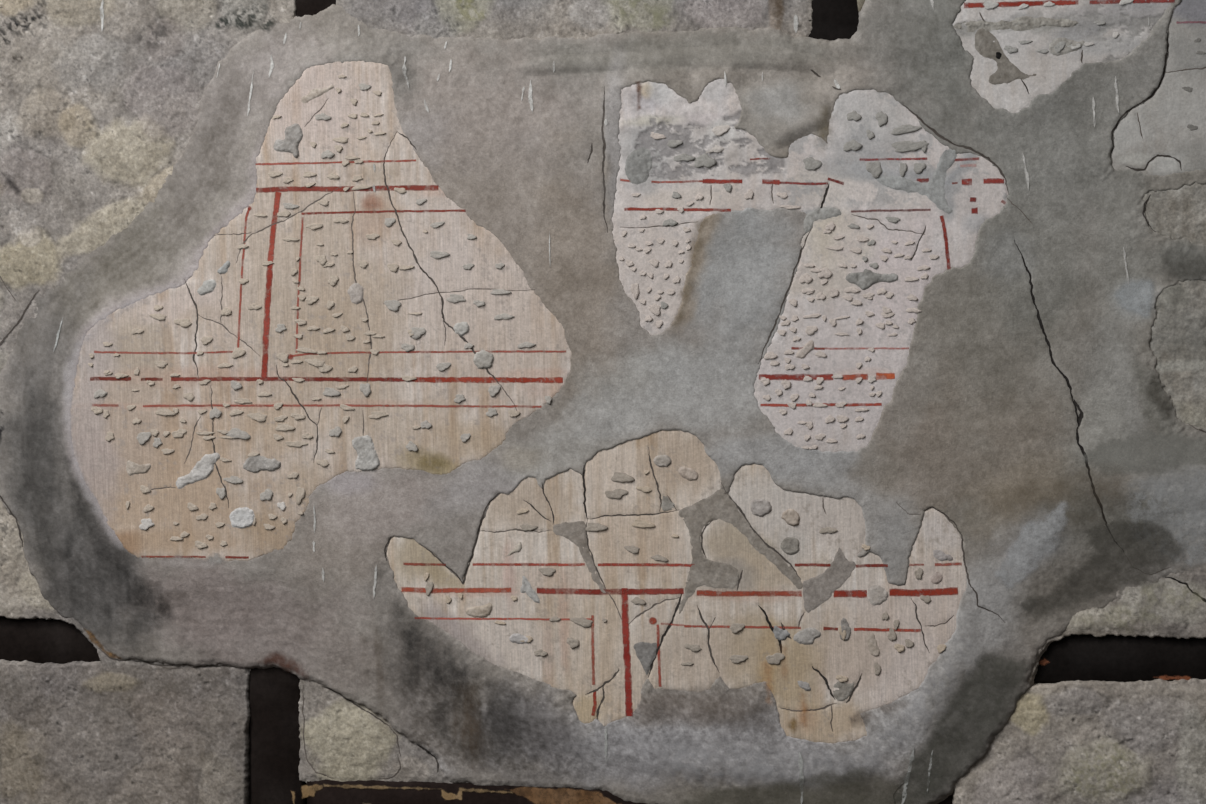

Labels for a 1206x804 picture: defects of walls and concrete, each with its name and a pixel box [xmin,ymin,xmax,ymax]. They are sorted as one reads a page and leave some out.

spalling [953,16,1085,85]
spalling [273,123,303,158]
crack [383,131,535,410]
spalling [846,269,898,290]
crack [151,187,372,508]
crack [903,105,1206,602]
spalling [243,455,281,473]
spalling [229,507,255,529]
crack [422,484,554,584]
crack [582,447,720,677]
spalling [751,499,800,555]
crack [896,502,1002,652]